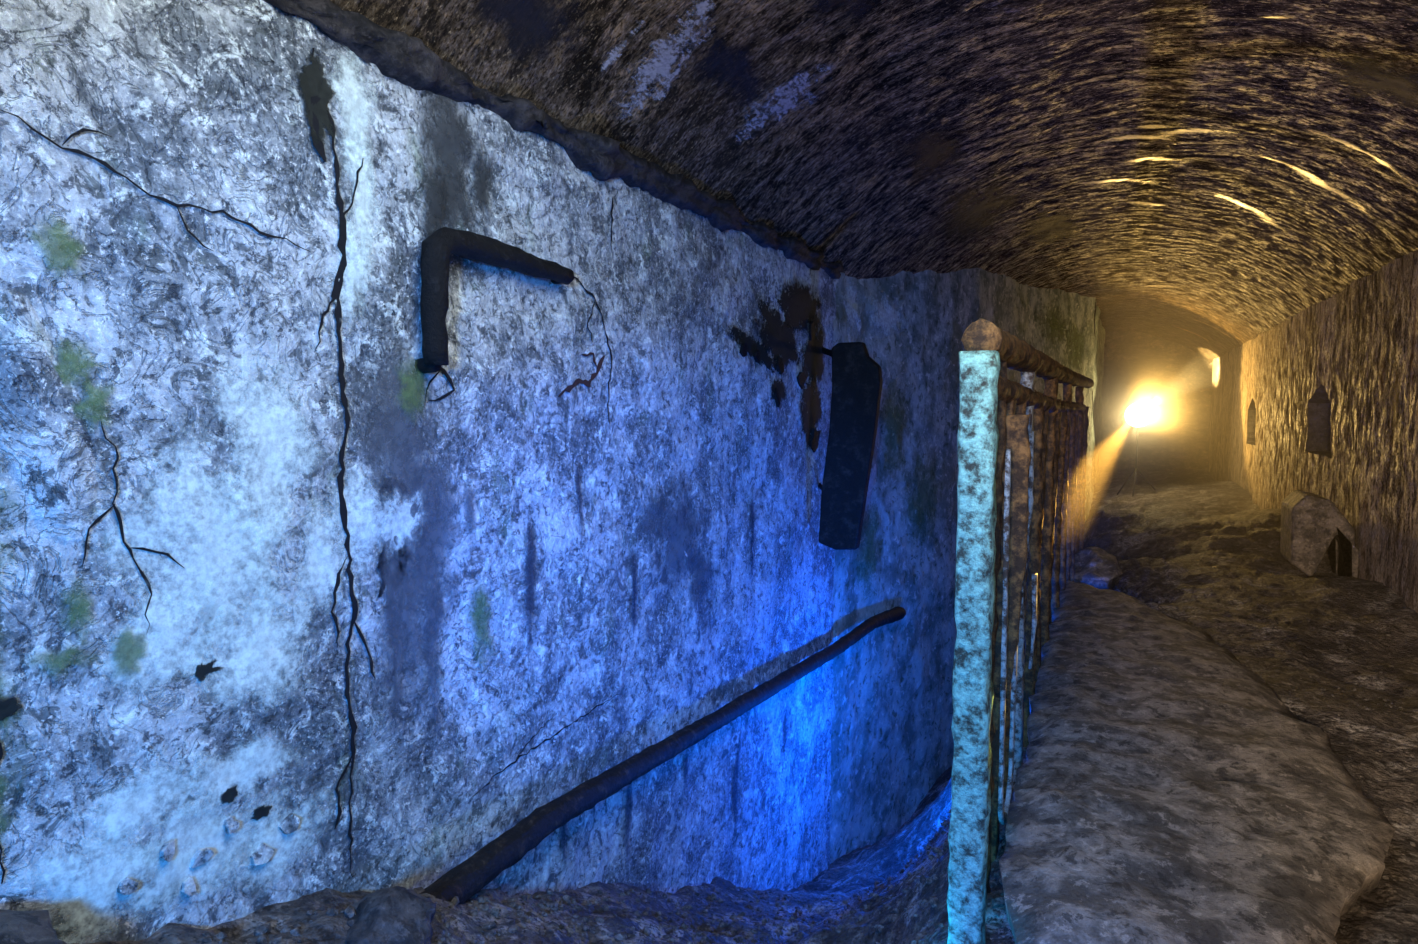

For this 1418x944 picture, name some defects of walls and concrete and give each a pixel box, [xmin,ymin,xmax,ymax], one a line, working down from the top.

crack [0,845,8,884]
crack [0,48,375,877]